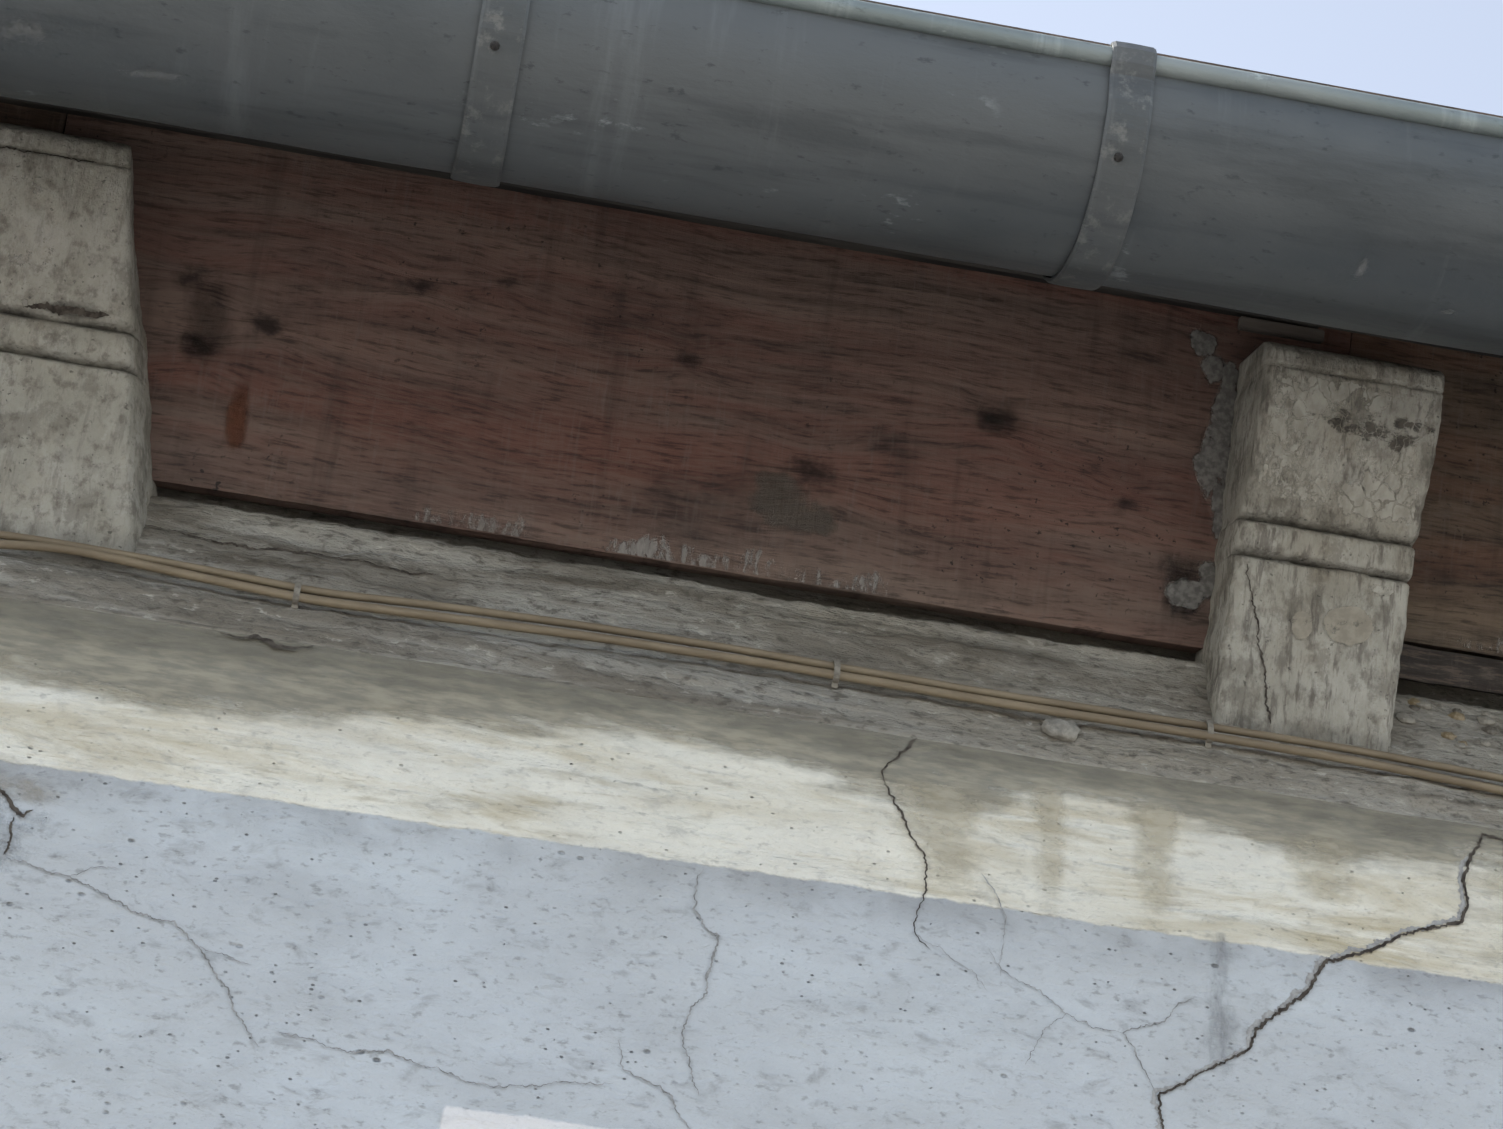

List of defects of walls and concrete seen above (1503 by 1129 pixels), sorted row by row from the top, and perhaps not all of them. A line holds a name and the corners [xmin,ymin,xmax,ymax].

leakage [0,597,1503,865]
crack [1245,564,1271,724]
crack [0,856,720,1129]
crack [881,738,1503,1129]